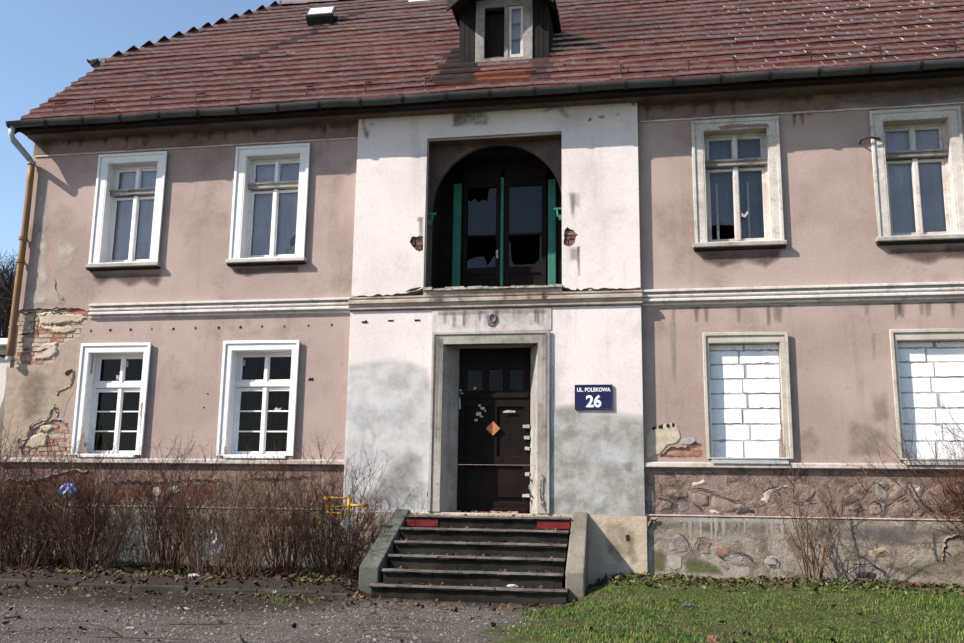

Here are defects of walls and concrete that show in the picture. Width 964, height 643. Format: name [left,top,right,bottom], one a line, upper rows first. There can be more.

flaking render [410,237,423,252]
flaking render [564,228,578,247]
peeling [3,308,94,458]
crack [18,369,74,442]
peeling [646,423,703,459]
flaking render [645,485,655,510]
flaking render [677,479,719,512]
peeling [761,484,788,503]
flaking render [909,483,925,505]
flaking render [843,548,890,581]